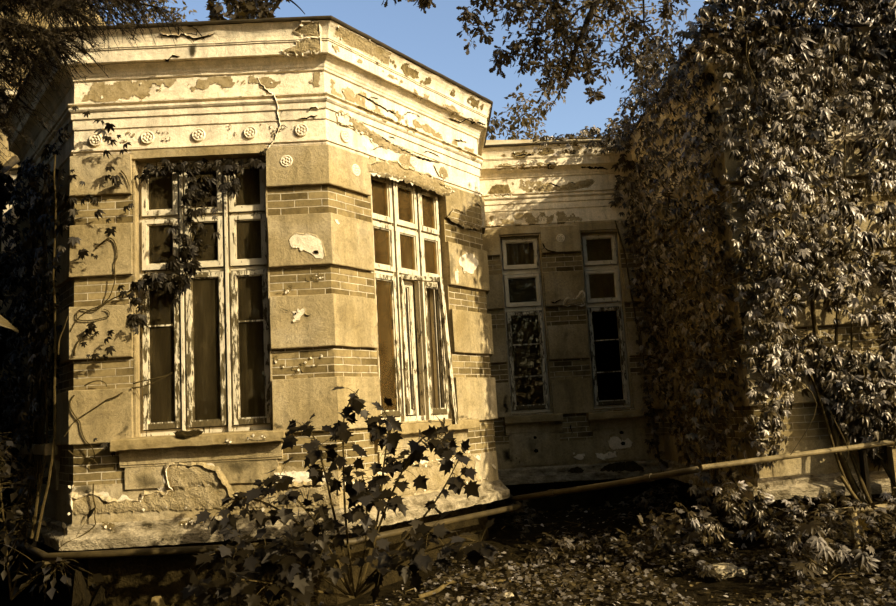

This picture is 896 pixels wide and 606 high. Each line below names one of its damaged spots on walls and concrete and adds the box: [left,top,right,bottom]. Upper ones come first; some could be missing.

spalling [279,20,431,100]
peeling [82,78,176,103]
peeling [188,75,281,98]
crack [257,77,319,149]
spalling [309,72,595,230]
peeling [288,232,326,262]
peeling [454,249,480,285]
peeling [291,307,307,322]
peeling [573,434,633,461]